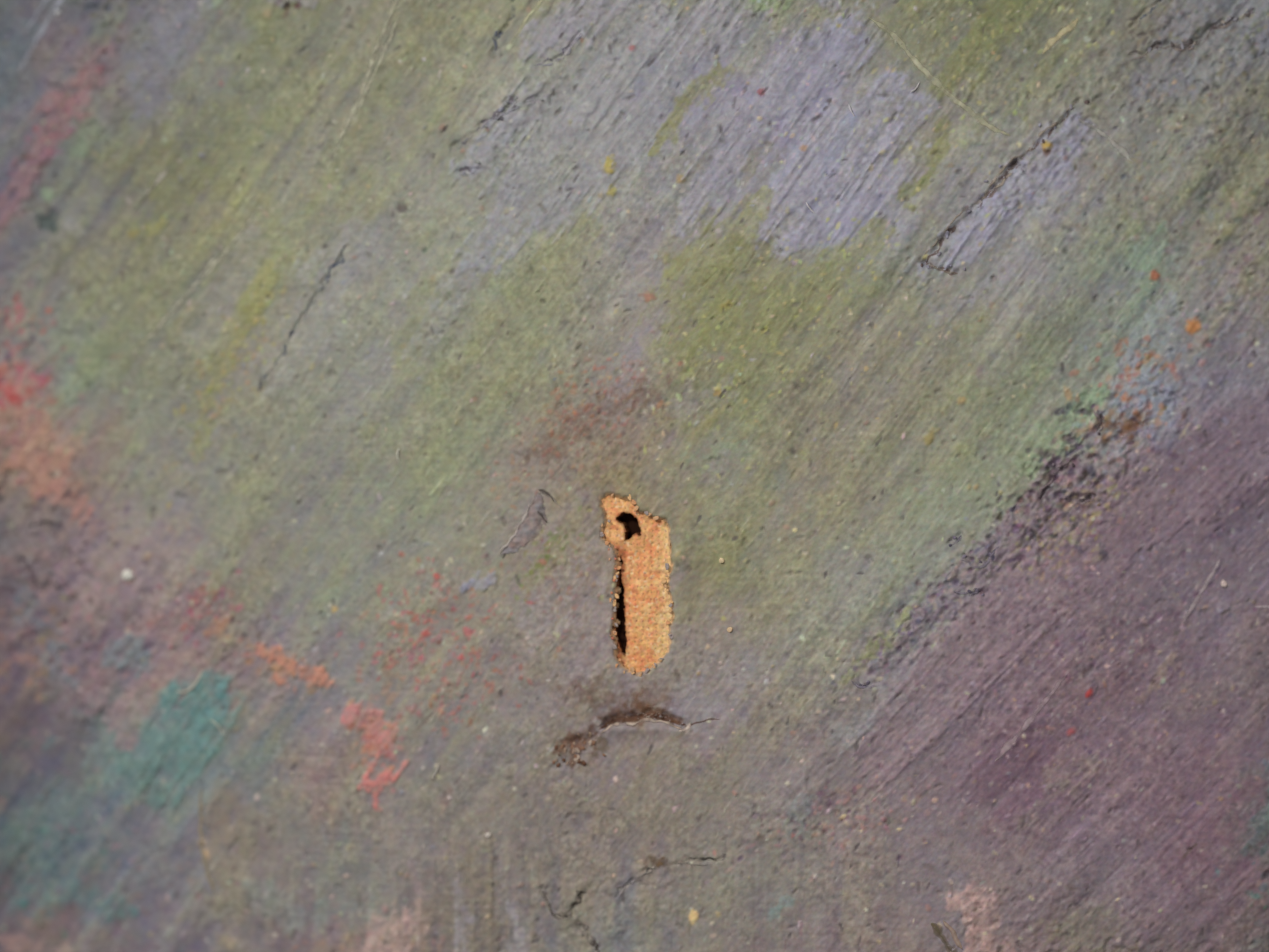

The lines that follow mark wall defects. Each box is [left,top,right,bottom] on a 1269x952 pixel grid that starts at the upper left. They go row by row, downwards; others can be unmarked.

crack [920,100,1089,275]
crack [259,245,346,389]
peeling [599,493,675,677]